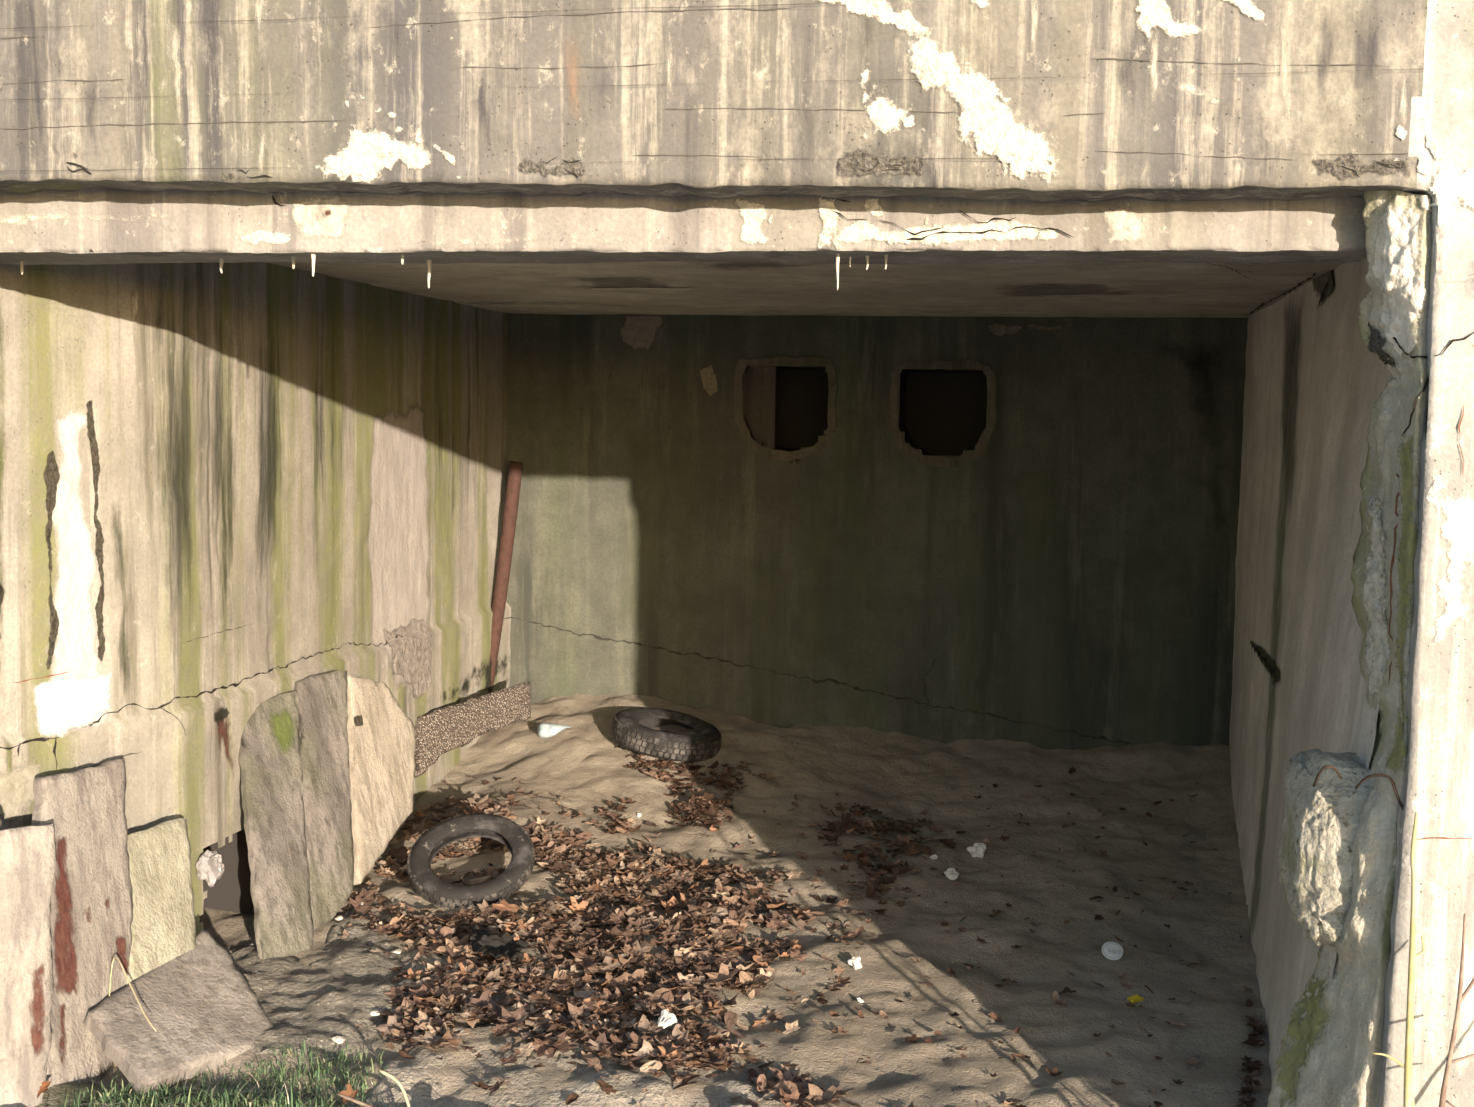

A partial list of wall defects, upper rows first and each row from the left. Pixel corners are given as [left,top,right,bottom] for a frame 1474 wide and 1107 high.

peeling [316,96,460,184]
peeling [819,0,1059,183]
peeling [1136,0,1202,38]
flaking render [34,400,112,736]
damp [170,358,190,588]
damp [215,381,232,589]
damp [259,366,276,535]
crack [1388,474,1399,685]
crack [1393,332,1474,437]
crack [0,634,406,769]
damp [444,657,507,699]
crack [505,617,1135,745]